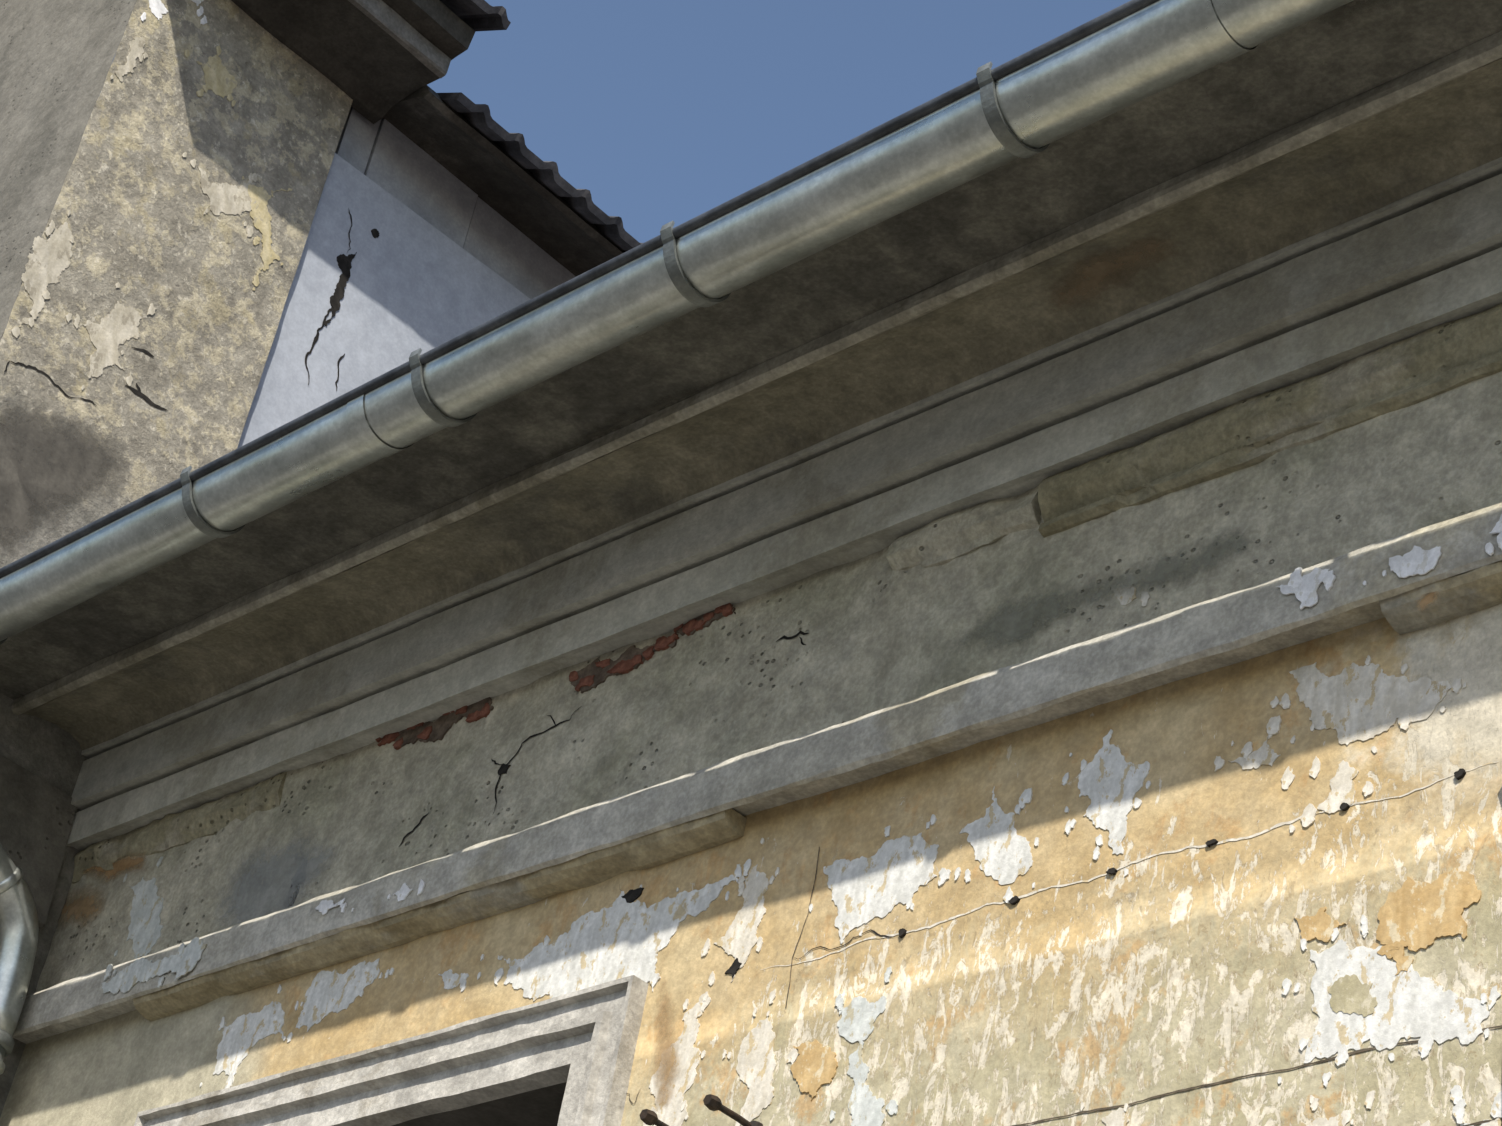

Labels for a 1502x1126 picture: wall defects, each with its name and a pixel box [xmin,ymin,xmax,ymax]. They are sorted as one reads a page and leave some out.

peeling [11,209,74,338]
peeling [182,152,292,291]
crack [4,347,167,410]
crack [305,299,345,391]
water stain [0,406,119,544]
crack [491,706,582,811]
peeling [823,786,1039,944]
peeling [1061,729,1151,877]
peeling [1214,655,1467,833]
peeling [200,958,394,1088]
peeling [438,859,799,1126]
peeling [1282,915,1502,1126]